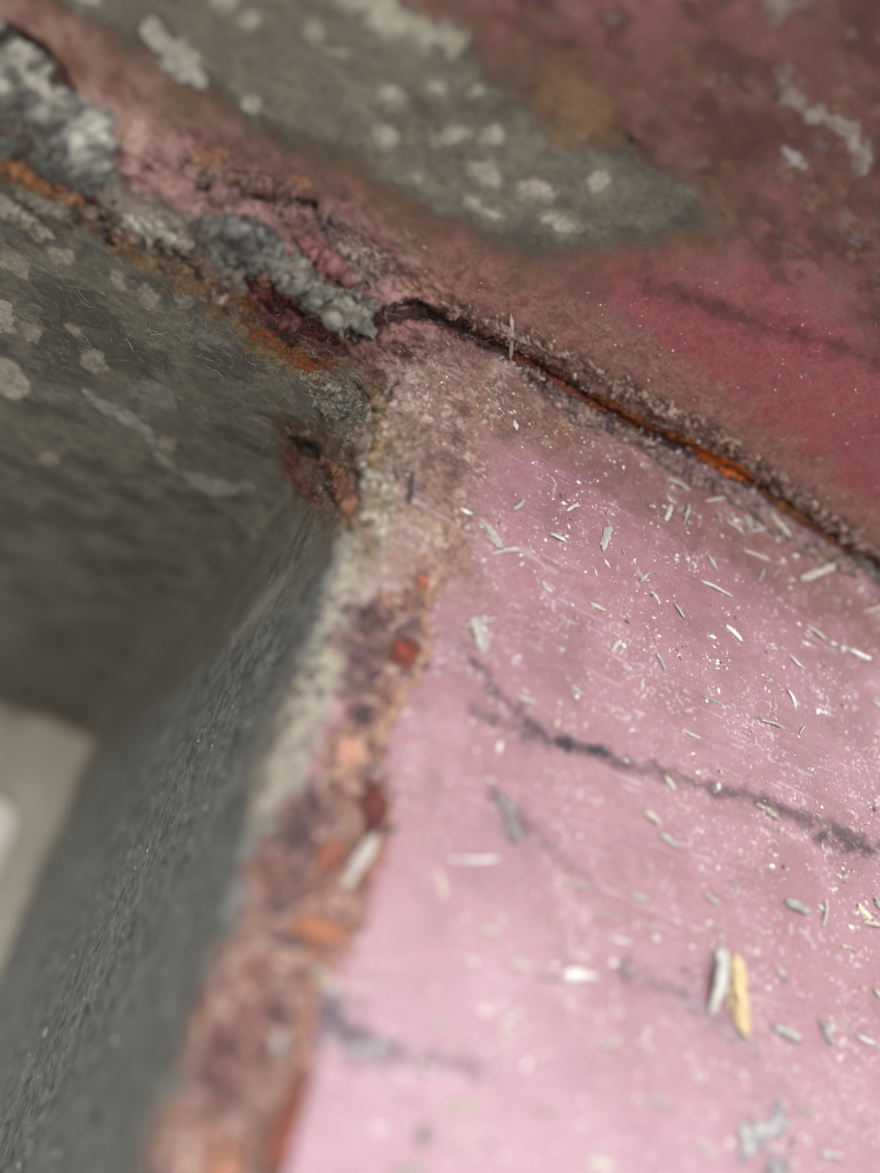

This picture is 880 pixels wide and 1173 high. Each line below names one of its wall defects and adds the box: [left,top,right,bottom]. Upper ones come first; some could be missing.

peeling [0,21,118,243]
rust [74,179,256,326]
rust [126,146,316,213]
peeling [68,0,731,271]
crack [271,413,376,533]
crack [347,293,880,584]